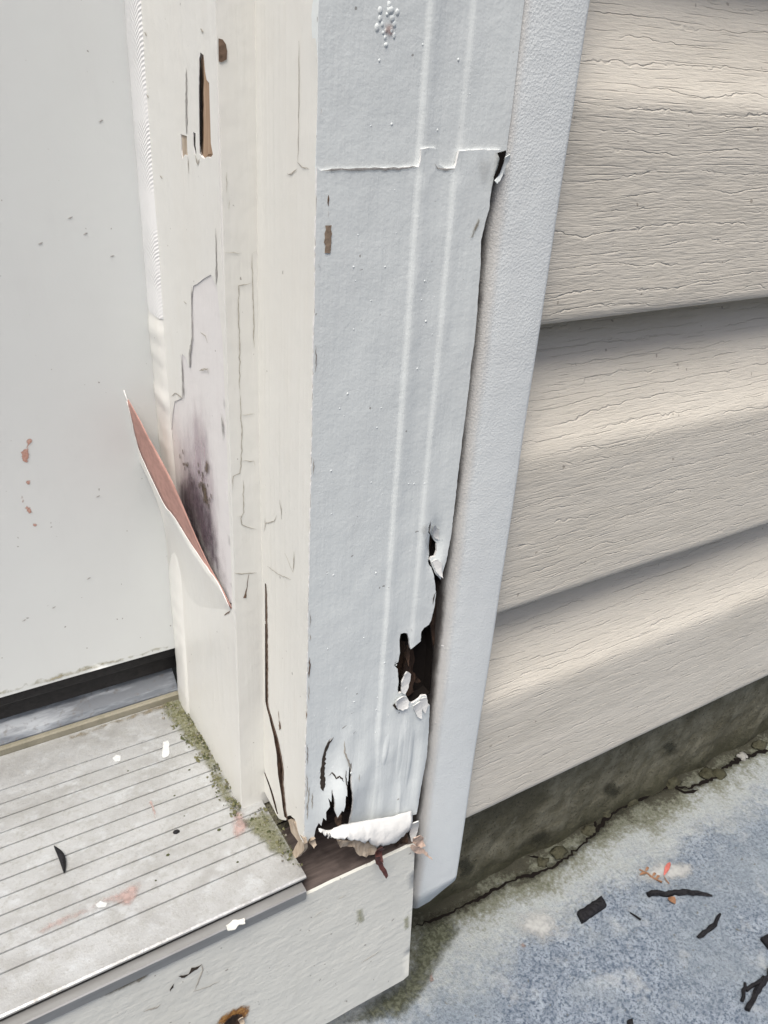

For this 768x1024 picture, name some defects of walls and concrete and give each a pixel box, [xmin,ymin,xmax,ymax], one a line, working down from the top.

spalling [218,38,227,62]
spalling [182,55,213,173]
crack [288,162,454,175]
crack [172,290,208,398]
crack [215,230,282,530]
peeling [124,390,232,615]
mould [179,447,217,571]
spalling [428,539,443,594]
crack [236,554,360,822]
spalling [395,623,433,719]
peeling [318,810,419,857]
crack [415,749,768,926]